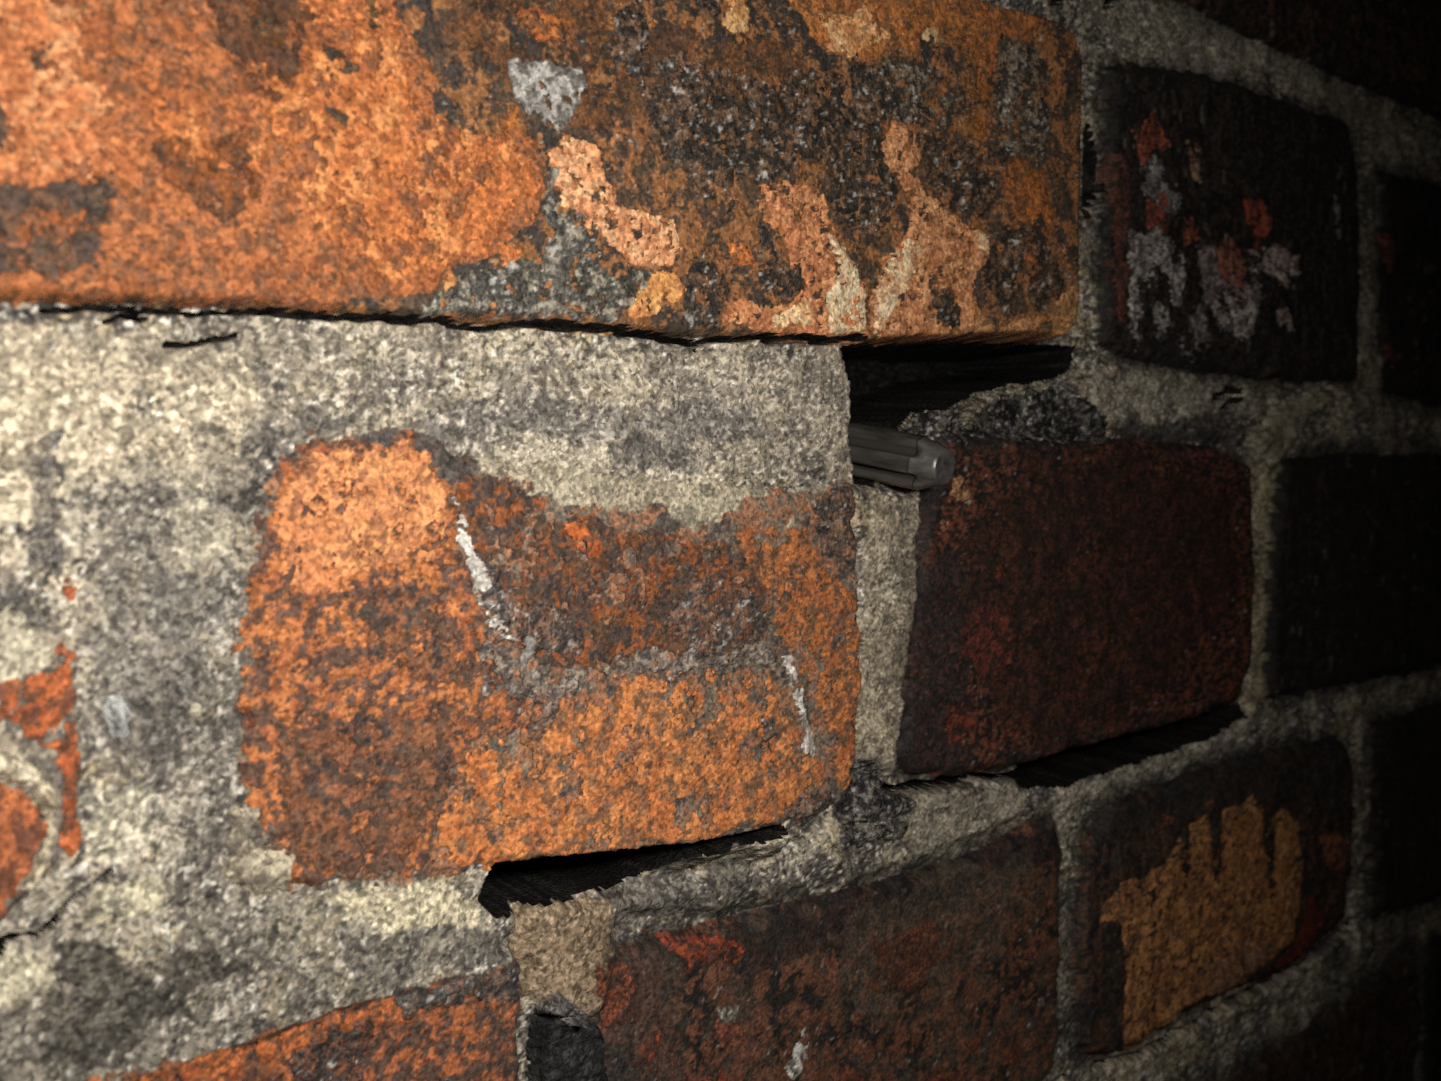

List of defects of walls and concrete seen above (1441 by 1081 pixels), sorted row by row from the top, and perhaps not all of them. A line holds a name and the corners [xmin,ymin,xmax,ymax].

crack [38,303,868,352]
crack [880,771,1005,793]